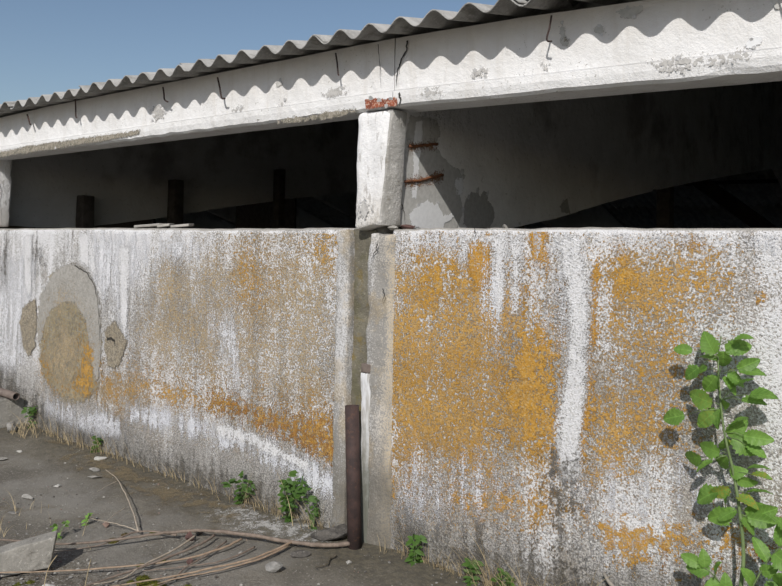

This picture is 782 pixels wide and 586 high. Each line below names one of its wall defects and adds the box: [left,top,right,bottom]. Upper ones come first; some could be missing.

crack [378,40,408,107]
peeling [647,37,762,75]
spalling [0,129,141,157]
spalling [277,96,397,124]
rust [407,138,438,154]
rust [404,169,444,188]
peeling [400,113,495,229]
peeling [19,261,127,414]
water stain [0,230,335,541]
water stain [391,230,731,586]